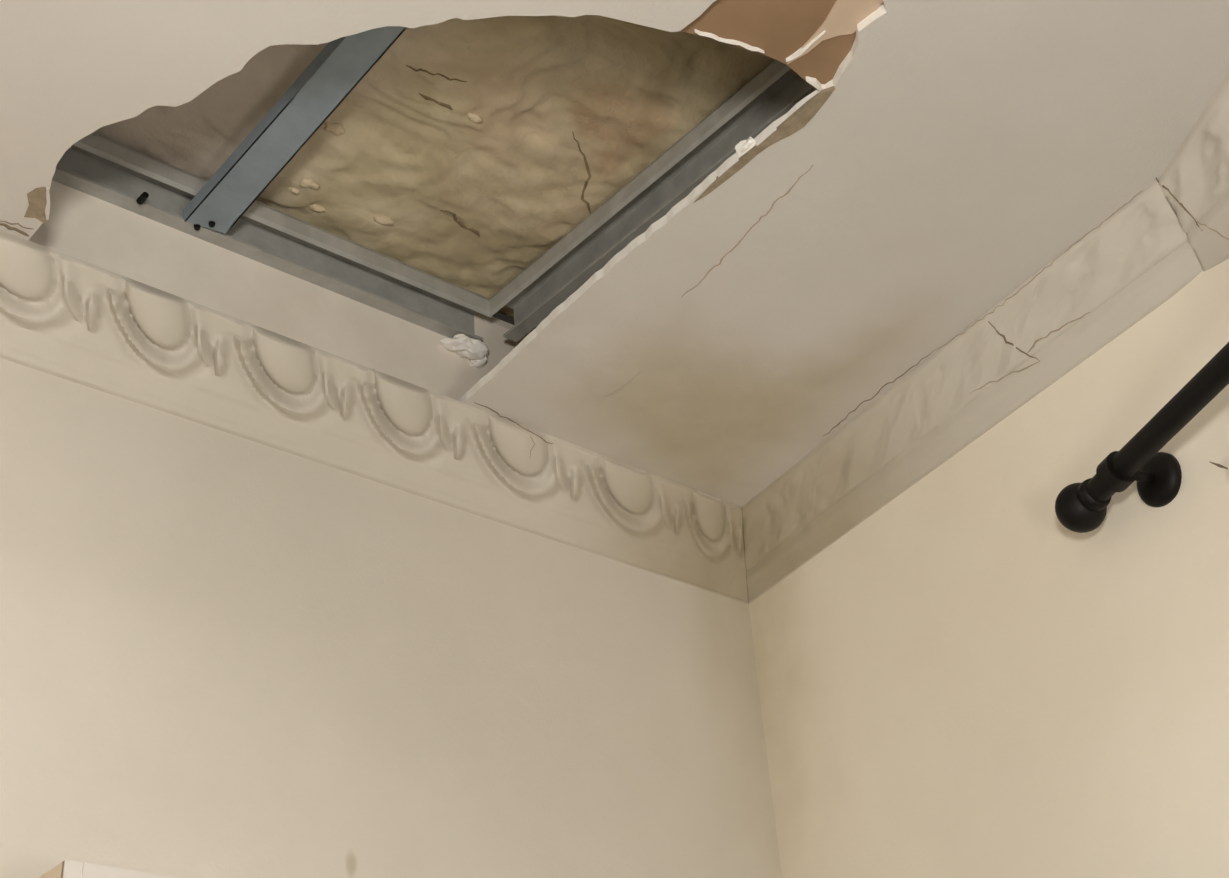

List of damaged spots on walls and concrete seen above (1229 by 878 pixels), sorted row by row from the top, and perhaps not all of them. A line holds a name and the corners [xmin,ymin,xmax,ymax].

peeling [681,0,856,202]
spalling [440,334,489,368]
crack [682,165,813,297]
crack [823,178,1229,436]